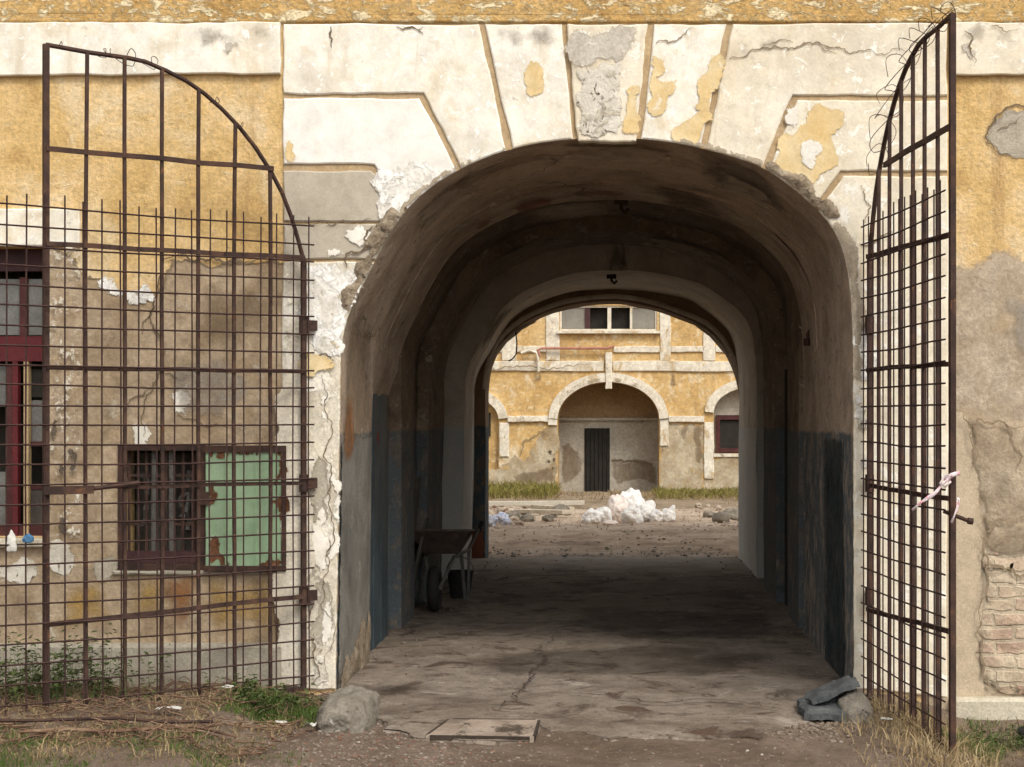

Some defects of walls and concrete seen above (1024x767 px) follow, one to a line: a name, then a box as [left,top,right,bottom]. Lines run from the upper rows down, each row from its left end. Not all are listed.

peeling [524,60,545,97]
flaking render [561,25,676,138]
peeling [671,53,846,183]
crack [729,39,906,59]
flaking render [987,109,1024,158]
peeling [345,160,471,247]
flaking render [948,250,1024,446]
flaking render [0,246,371,688]
flaking render [975,493,1024,697]
crack [500,628,691,706]